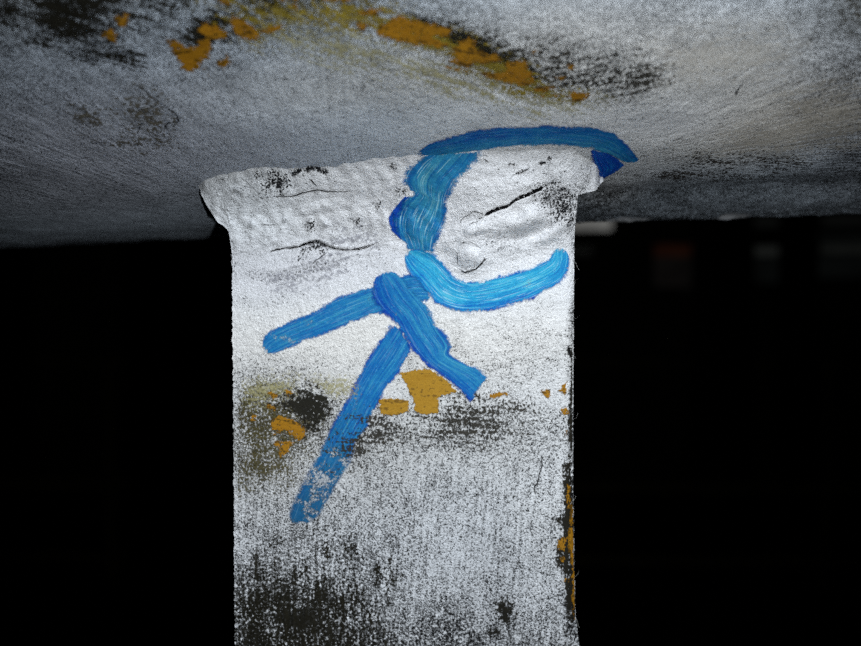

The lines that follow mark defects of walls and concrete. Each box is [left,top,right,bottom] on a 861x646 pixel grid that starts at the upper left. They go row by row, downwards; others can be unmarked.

damp [0,0,49,36]
damp [60,24,147,75]
crack [273,179,350,197]
crack [271,240,380,264]
crack [456,187,544,273]
damp [292,522,392,627]